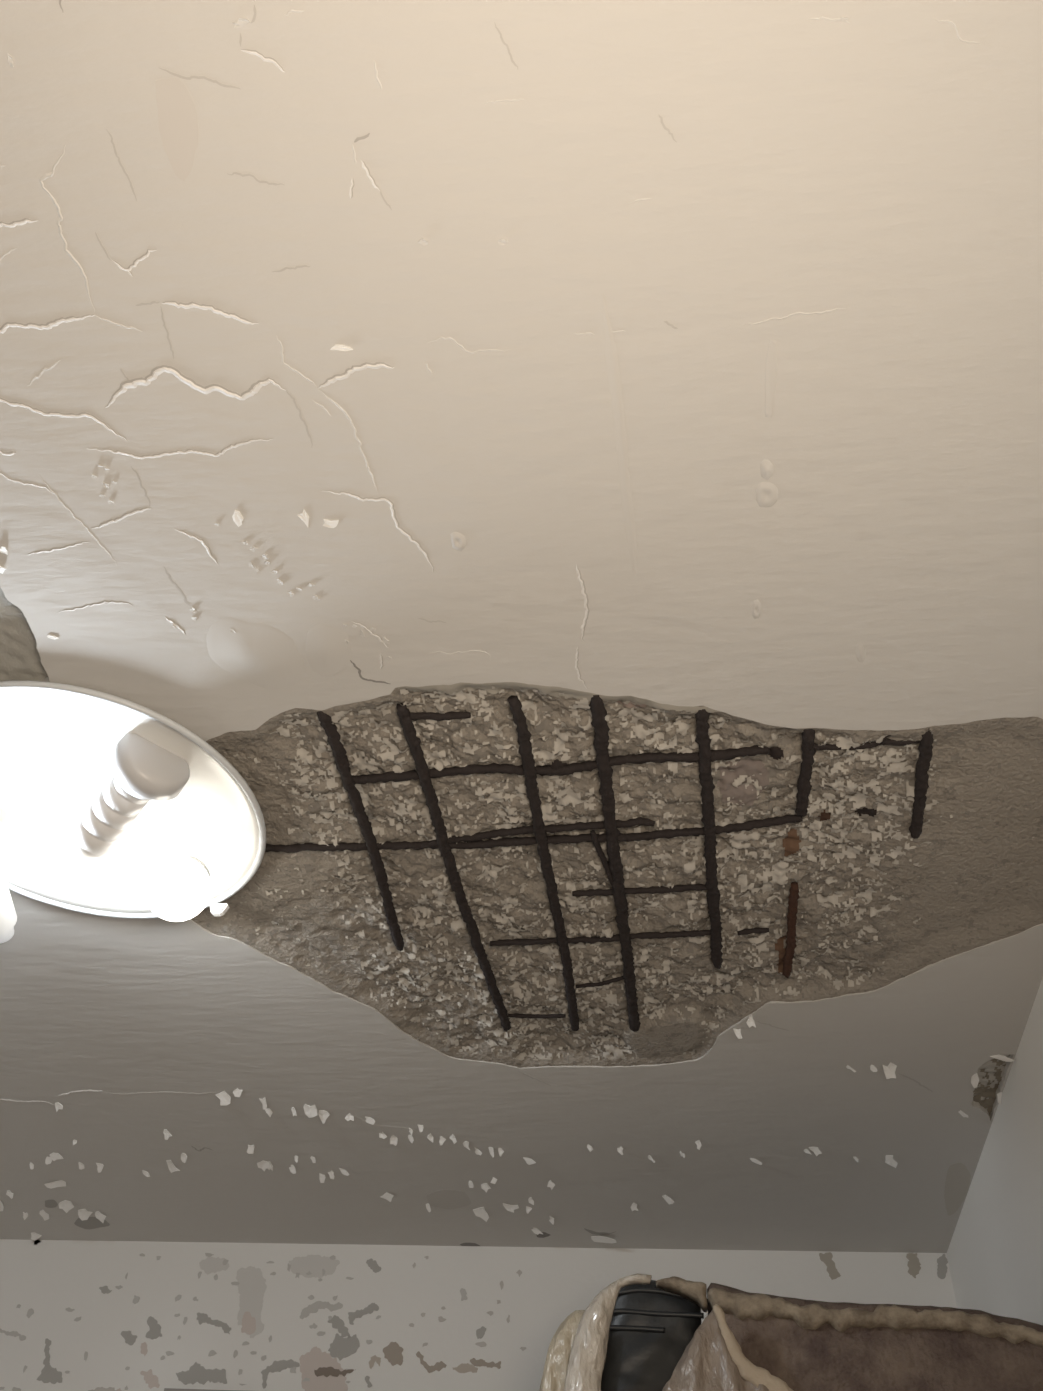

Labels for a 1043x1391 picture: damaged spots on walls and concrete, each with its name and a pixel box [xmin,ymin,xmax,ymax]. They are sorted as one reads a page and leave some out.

crack [239,5,304,72]
crack [349,133,392,210]
crack [0,146,511,572]
crack [58,600,134,613]
crack [163,566,198,635]
corrosion [783,828,801,856]
spalling [191,682,1043,1068]
peeling [216,1088,242,1106]
spalling [959,1055,1015,1118]
peeling [291,1104,504,1157]
peeling [299,1346,348,1391]
peeling [369,1342,501,1373]